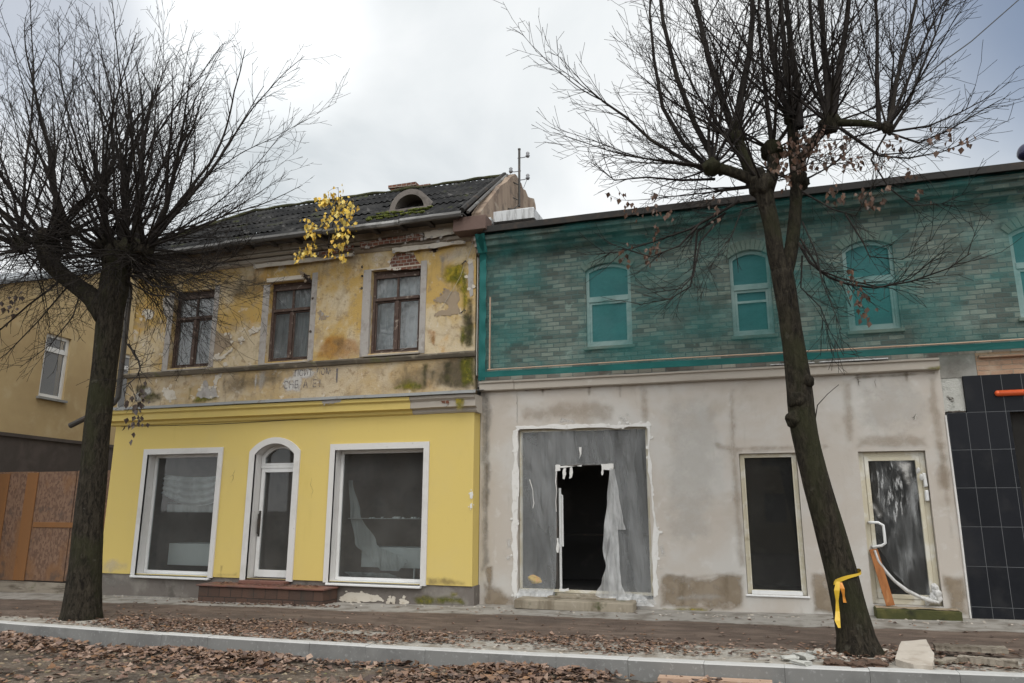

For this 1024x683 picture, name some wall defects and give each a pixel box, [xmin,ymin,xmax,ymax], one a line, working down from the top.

flaking render [387,228,466,271]
peeling [433,261,475,317]
leakage [439,266,473,386]
flaking render [196,326,261,399]
flaking render [339,591,409,604]